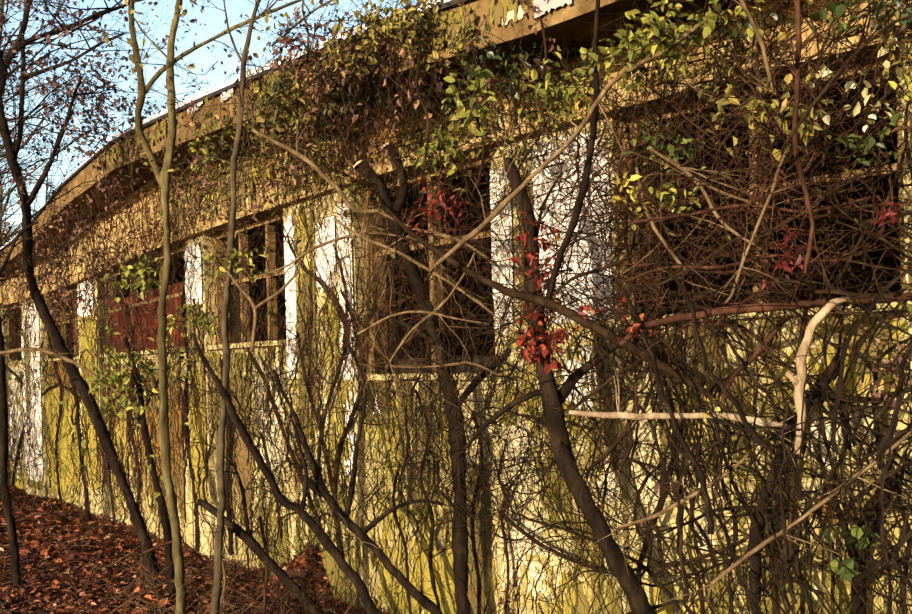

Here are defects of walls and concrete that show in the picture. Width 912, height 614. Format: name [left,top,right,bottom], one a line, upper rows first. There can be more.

peeling [501,0,572,26]